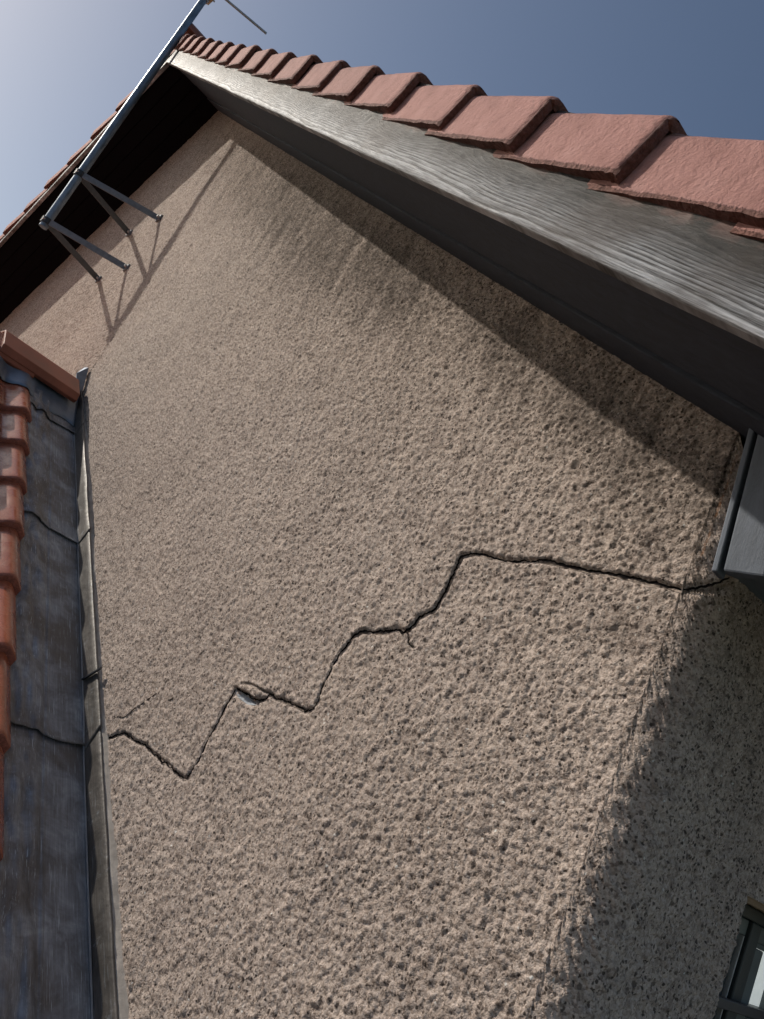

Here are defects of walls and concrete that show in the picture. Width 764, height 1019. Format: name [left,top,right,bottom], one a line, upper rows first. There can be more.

crack [109,553,730,779]